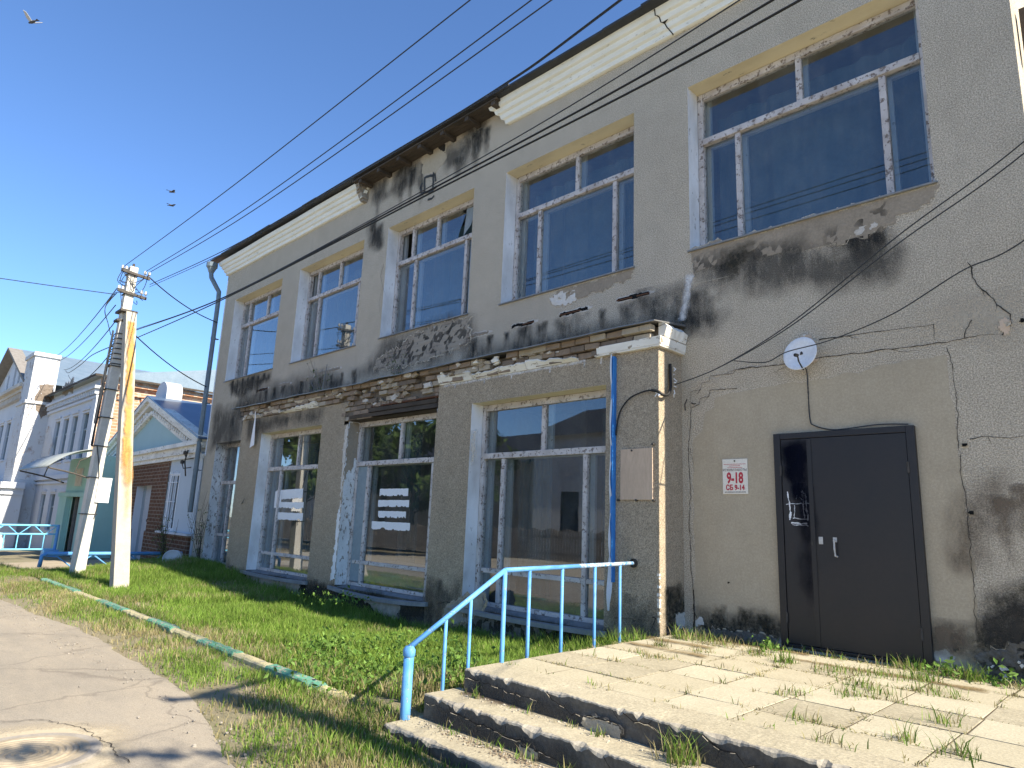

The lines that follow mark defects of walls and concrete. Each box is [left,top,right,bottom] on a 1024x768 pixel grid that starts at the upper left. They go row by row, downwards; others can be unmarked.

leakage [447,122,490,169]
leakage [373,164,423,200]
leakage [371,223,382,248]
spalling [690,184,941,274]
spalling [549,268,655,318]
leakage [622,213,898,329]
crack [819,262,1021,629]
flaking render [240,315,661,630]
leakage [992,485,1024,532]